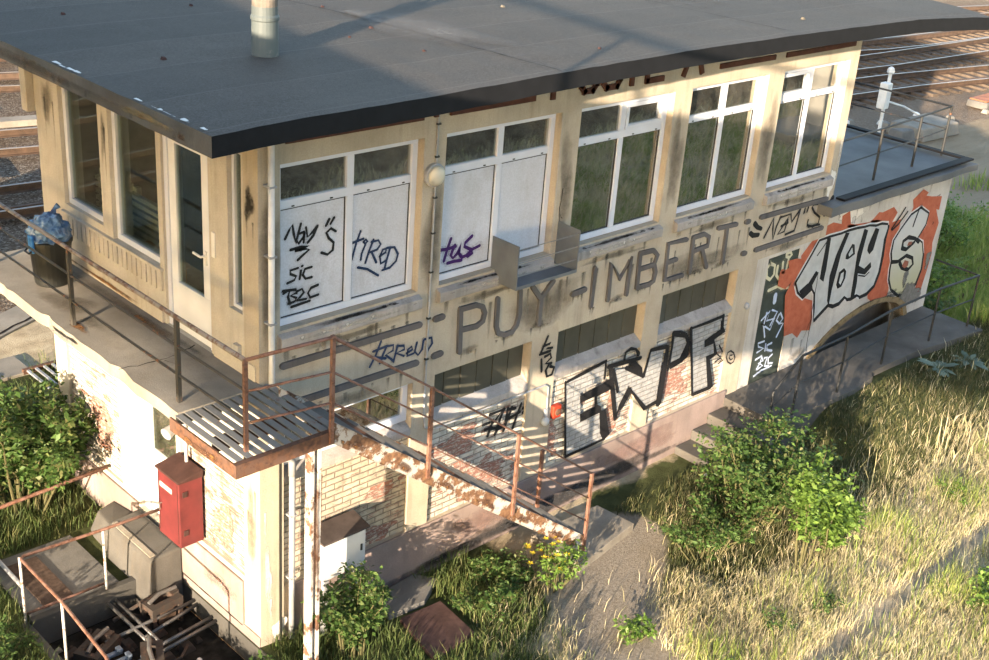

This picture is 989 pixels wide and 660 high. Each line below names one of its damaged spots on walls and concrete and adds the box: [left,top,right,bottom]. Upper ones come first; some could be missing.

peeling [658,365,690,399]
peeling [80,378,119,452]
peeling [605,391,626,436]
corrosion [184,436,215,460]
corrosion [341,440,365,452]
peeling [431,422,515,483]
peeling [547,418,556,456]
peeling [363,474,406,500]
peeling [202,486,234,553]
corrosion [312,475,323,595]
peeling [365,520,398,544]